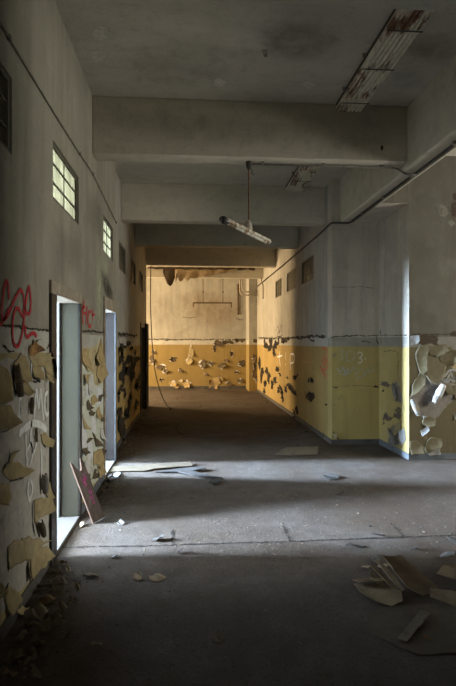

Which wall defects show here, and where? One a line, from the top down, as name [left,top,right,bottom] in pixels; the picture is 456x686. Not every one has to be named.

peeling [0,339,58,616]
peeling [82,338,109,485]
peeling [117,337,298,440]
peeling [380,331,456,456]